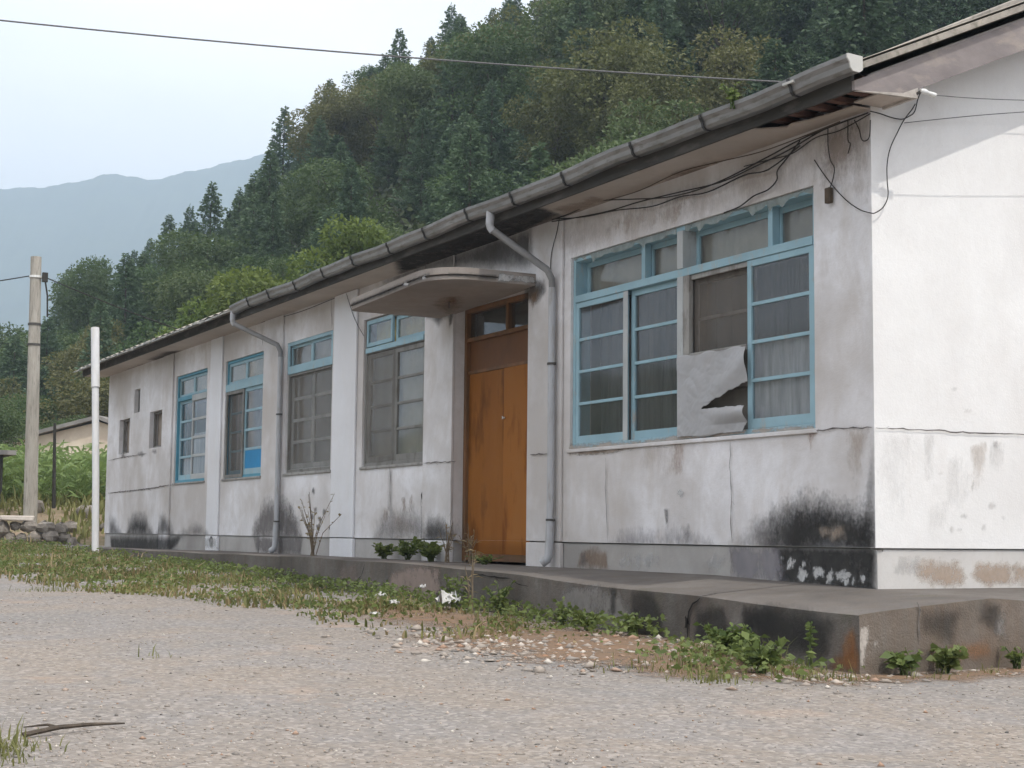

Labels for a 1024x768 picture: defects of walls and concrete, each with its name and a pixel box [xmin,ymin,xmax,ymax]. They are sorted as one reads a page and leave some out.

crack [817,427,1024,435]
crack [727,450,735,537]
water stain [110,519,178,549]
water stain [254,502,301,553]
mould [731,505,875,589]
peeling [781,556,865,586]